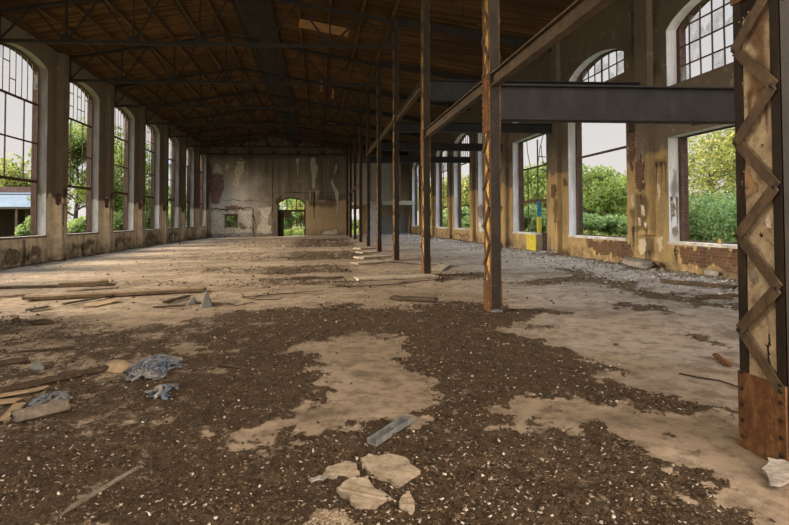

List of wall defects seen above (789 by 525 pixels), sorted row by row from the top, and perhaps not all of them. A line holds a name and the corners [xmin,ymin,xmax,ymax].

flaking render [208,158,245,210]
spalling [586,132,648,260]
spalling [742,168,760,196]
flaking render [215,220,272,234]
spalling [657,200,738,274]